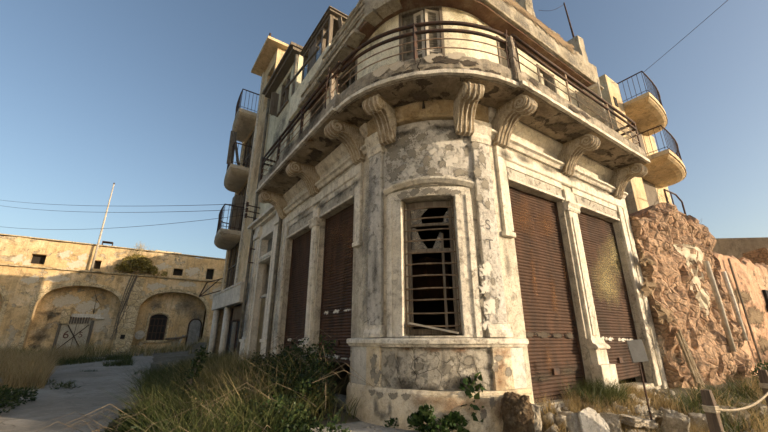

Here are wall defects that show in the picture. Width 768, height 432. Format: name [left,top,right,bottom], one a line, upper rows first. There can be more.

spalling [371,52,501,83]
peeling [384,129,490,210]
peeling [476,259,501,330]
peeling [673,243,710,317]
crack [395,354,478,389]